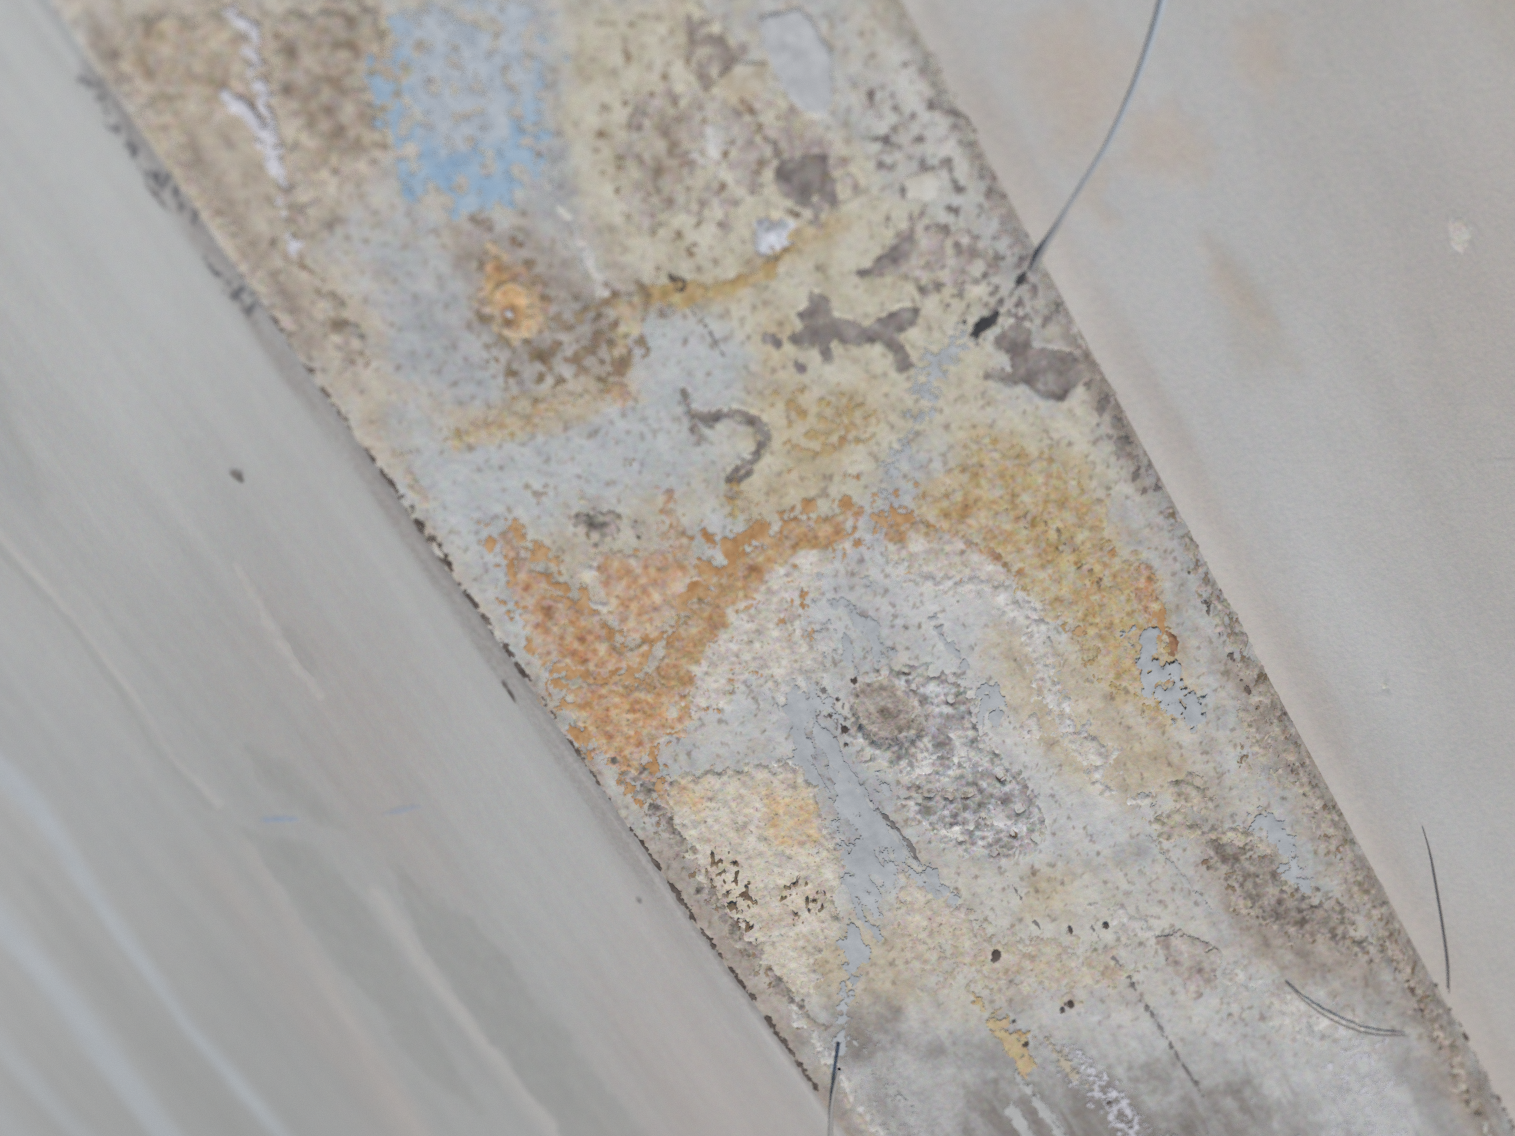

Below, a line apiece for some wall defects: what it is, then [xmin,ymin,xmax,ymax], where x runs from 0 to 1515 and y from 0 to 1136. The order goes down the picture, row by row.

spalling [77,70,267,328]
peeling [466,209,495,234]
peeling [591,2,1162,534]
rust [1082,580,1097,611]
peeling [1120,624,1221,733]
peeling [766,597,1011,1075]
peeling [1245,806,1314,894]
peeling [1085,891,1258,1023]
leakage [1249,976,1376,1049]
rust [1403,948,1436,1000]
leakage [1052,1040,1161,1136]